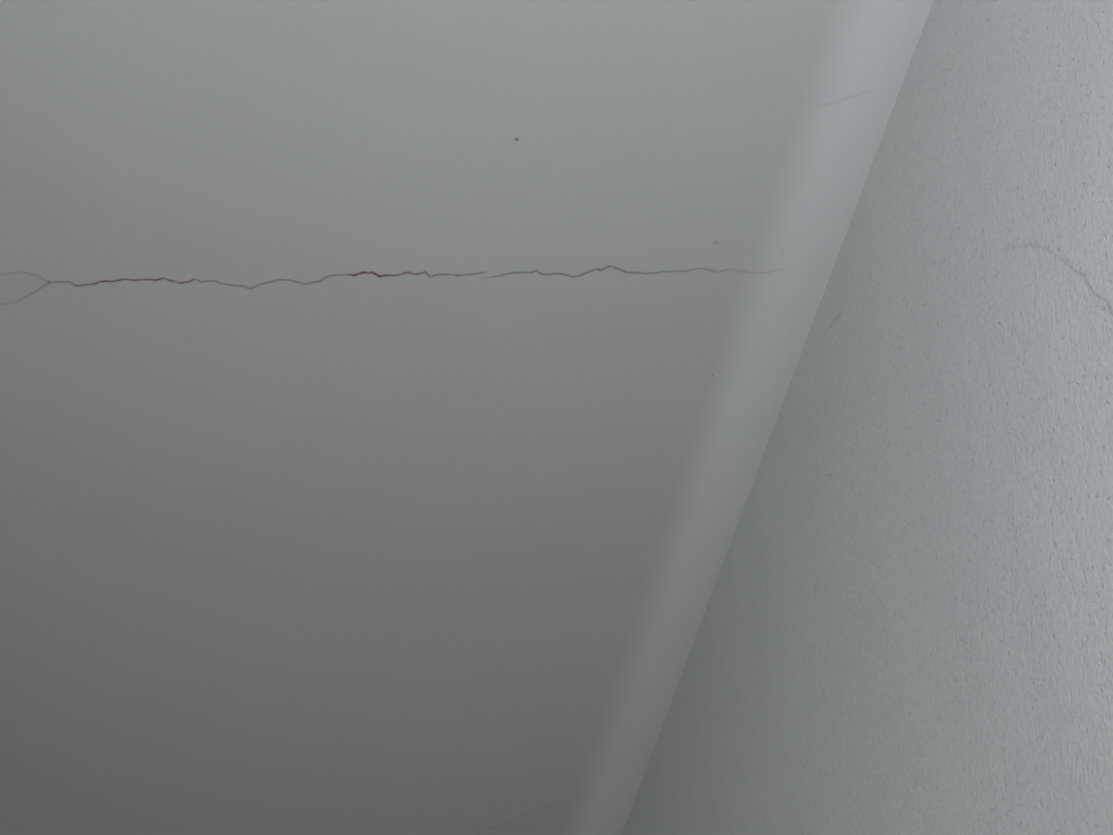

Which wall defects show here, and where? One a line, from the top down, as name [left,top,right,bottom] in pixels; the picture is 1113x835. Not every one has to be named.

crack [352,270,417,278]